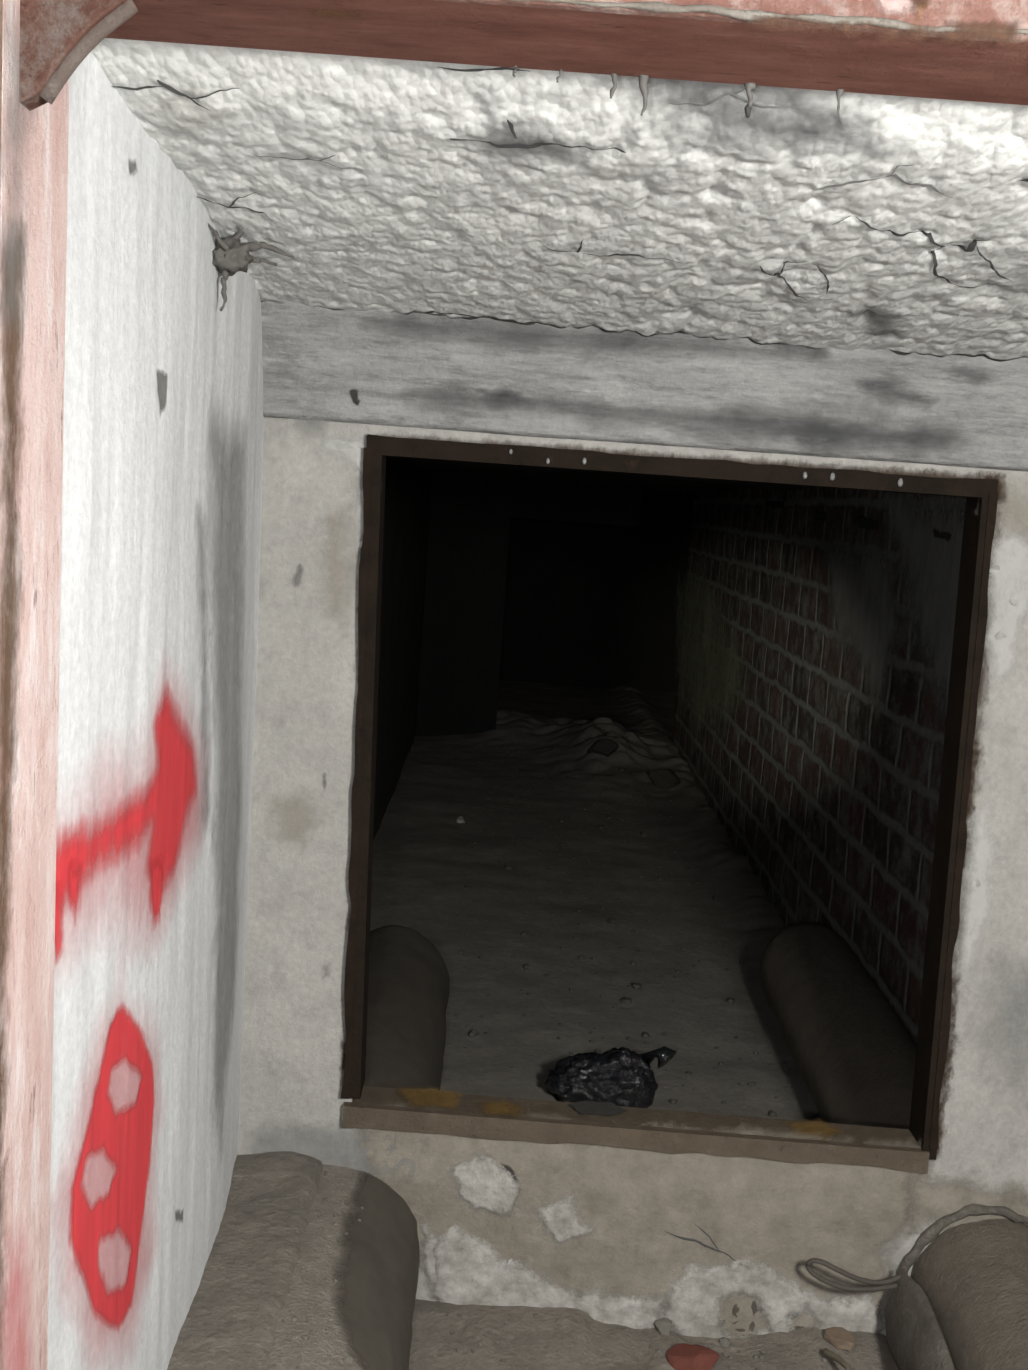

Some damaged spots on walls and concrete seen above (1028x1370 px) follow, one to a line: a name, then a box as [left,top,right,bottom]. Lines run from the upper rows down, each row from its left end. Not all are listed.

peeling [879,0,918,14]
crack [111,80,239,111]
crack [450,120,626,153]
crack [821,165,1012,288]
crack [759,261,829,301]
rust [0,234,24,1006]
flaking render [357,1128,922,1339]